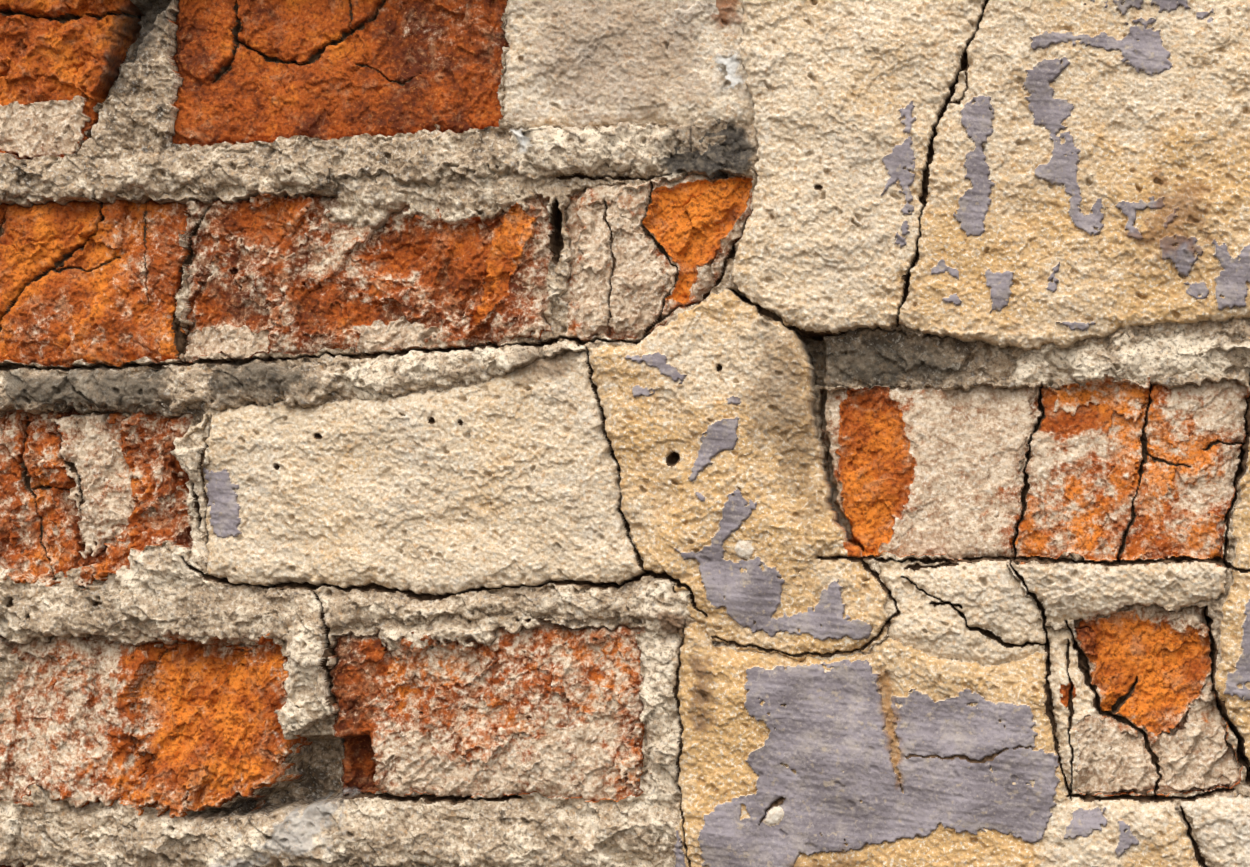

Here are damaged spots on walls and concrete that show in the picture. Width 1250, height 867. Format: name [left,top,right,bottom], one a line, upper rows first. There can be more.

crack [0,8,135,24]
crack [214,0,412,86]
crack [896,0,990,328]
peeling [1023,0,1250,311]
spalling [190,192,537,354]
crack [0,172,845,867]
spalling [835,386,918,558]
spalling [1010,375,1229,567]
spalling [118,633,313,818]
peeling [698,660,1061,867]
crack [712,375,1250,867]
spalling [1075,609,1238,791]